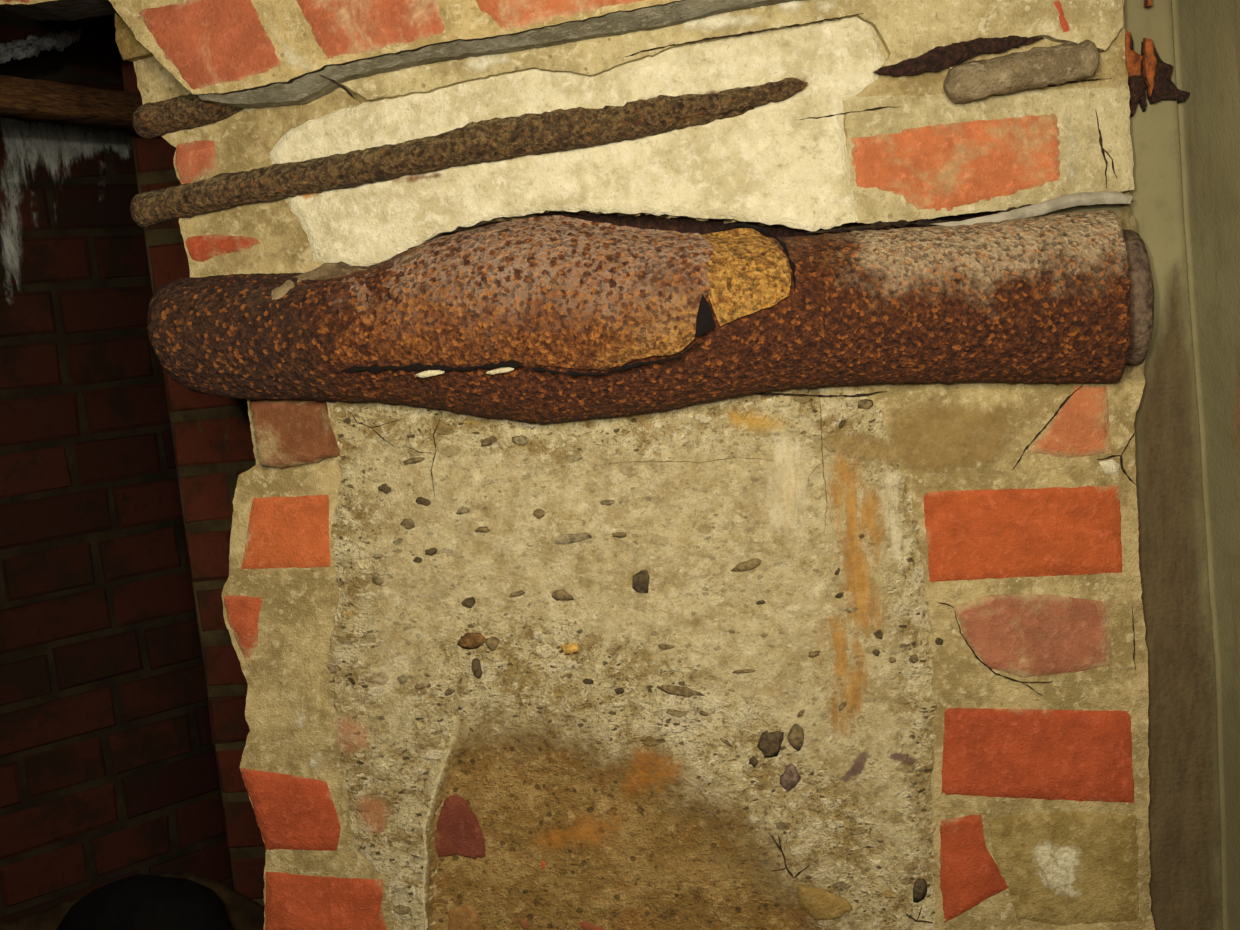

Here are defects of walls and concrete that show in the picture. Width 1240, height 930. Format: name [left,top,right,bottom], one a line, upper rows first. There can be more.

spalling [1053,0,1069,33]
spalling [873,35,1044,77]
corrosion [429,77,808,139]
spalling [175,140,217,184]
peeling [930,191,1133,226]
spalling [185,234,263,262]
corrosion [316,215,791,370]
crack [1013,384,1083,469]
crack [1100,432,1139,487]
corrosion [830,456,880,732]
damp [844,752,867,781]
damp [891,753,916,763]